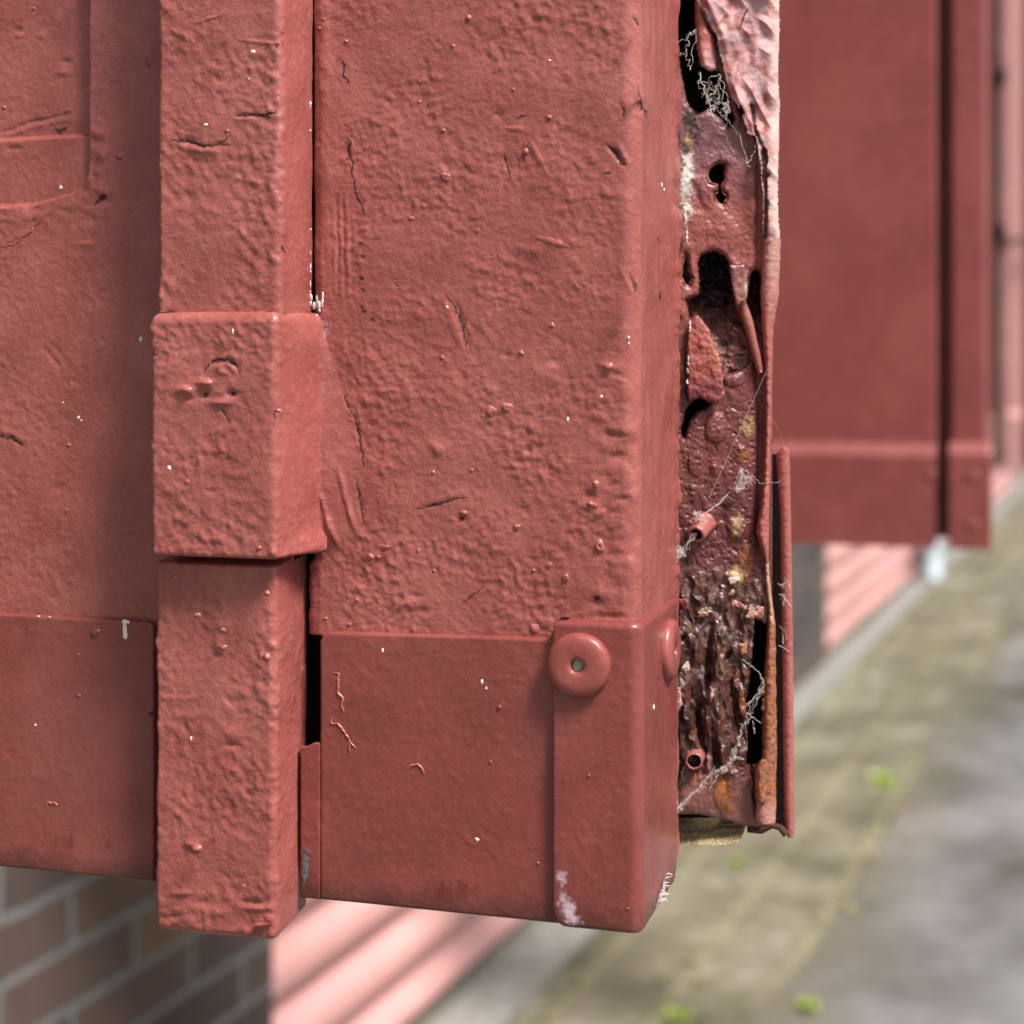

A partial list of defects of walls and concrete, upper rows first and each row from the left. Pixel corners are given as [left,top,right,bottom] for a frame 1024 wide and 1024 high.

crack [170,111,277,148]
peeling [694,0,780,239]
crack [346,134,365,214]
crack [446,294,468,347]
rust [683,251,764,374]
crack [204,355,240,374]
crack [344,393,365,525]
crack [416,497,466,509]
rust [721,514,764,620]
rust [679,599,722,621]
rust [732,669,745,717]
rust [754,759,770,802]